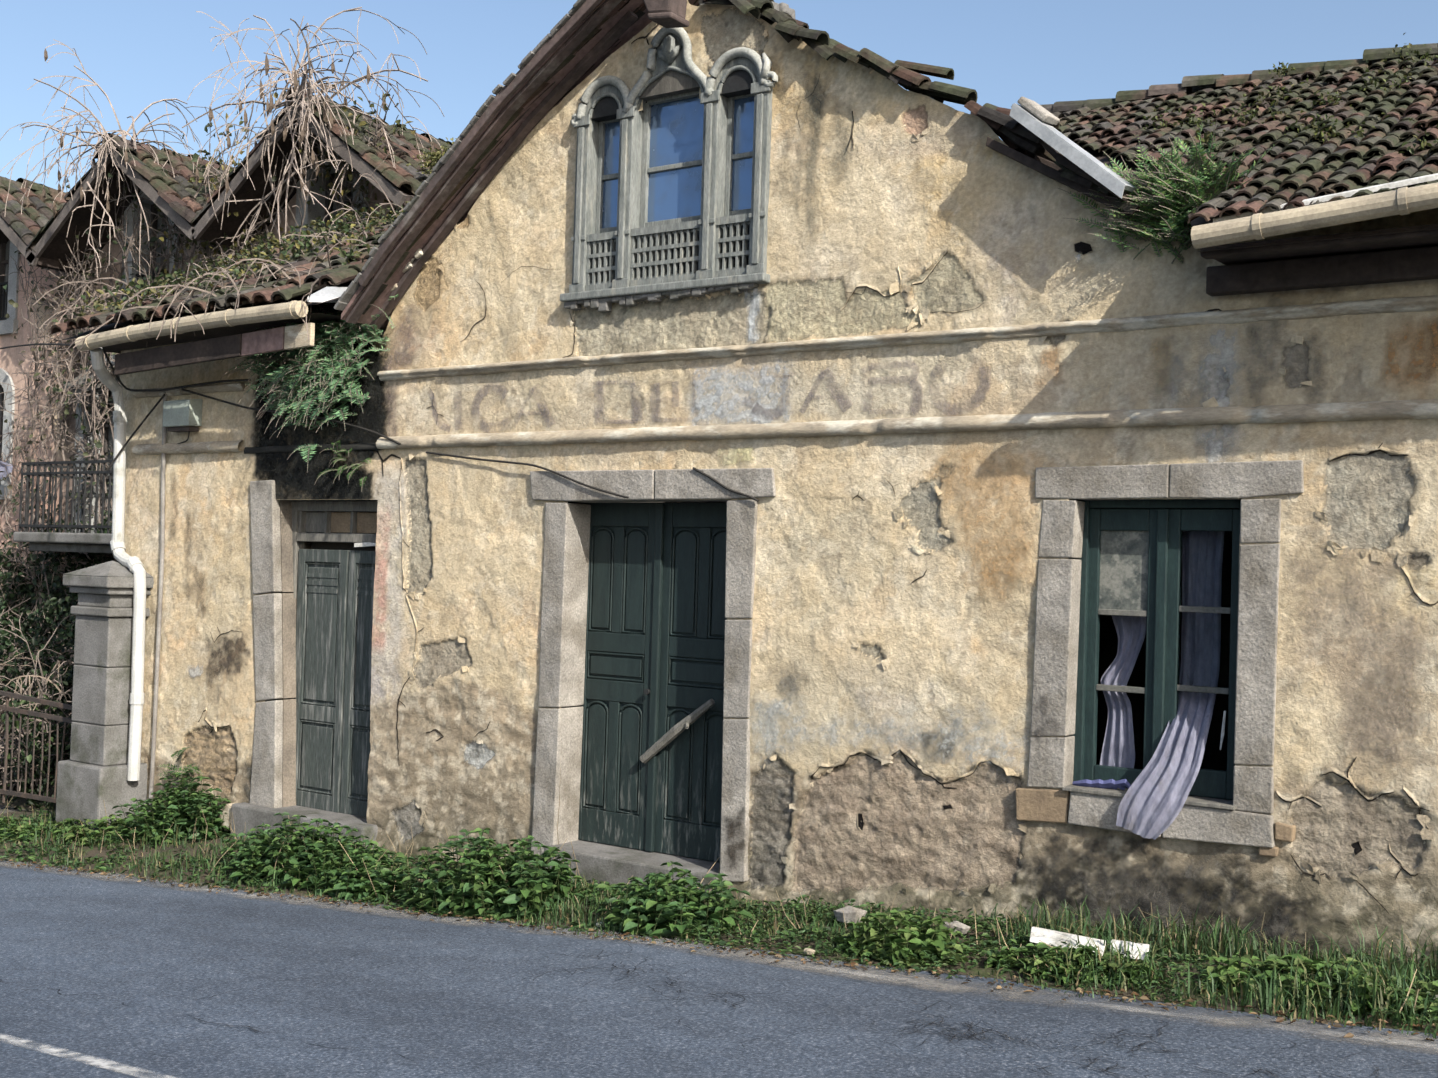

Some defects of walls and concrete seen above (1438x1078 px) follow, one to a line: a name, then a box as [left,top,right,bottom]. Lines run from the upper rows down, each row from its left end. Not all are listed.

crack [460,266,543,342]
spalling [568,252,985,361]
spalling [404,454,435,600]
spalling [894,465,954,555]
spalling [1315,451,1430,571]
crack [1401,566,1438,606]
spalling [408,636,472,690]
spalling [179,721,238,799]
spalling [748,752,1027,894]
spalling [1288,779,1434,883]
leakage [1117,870,1198,936]